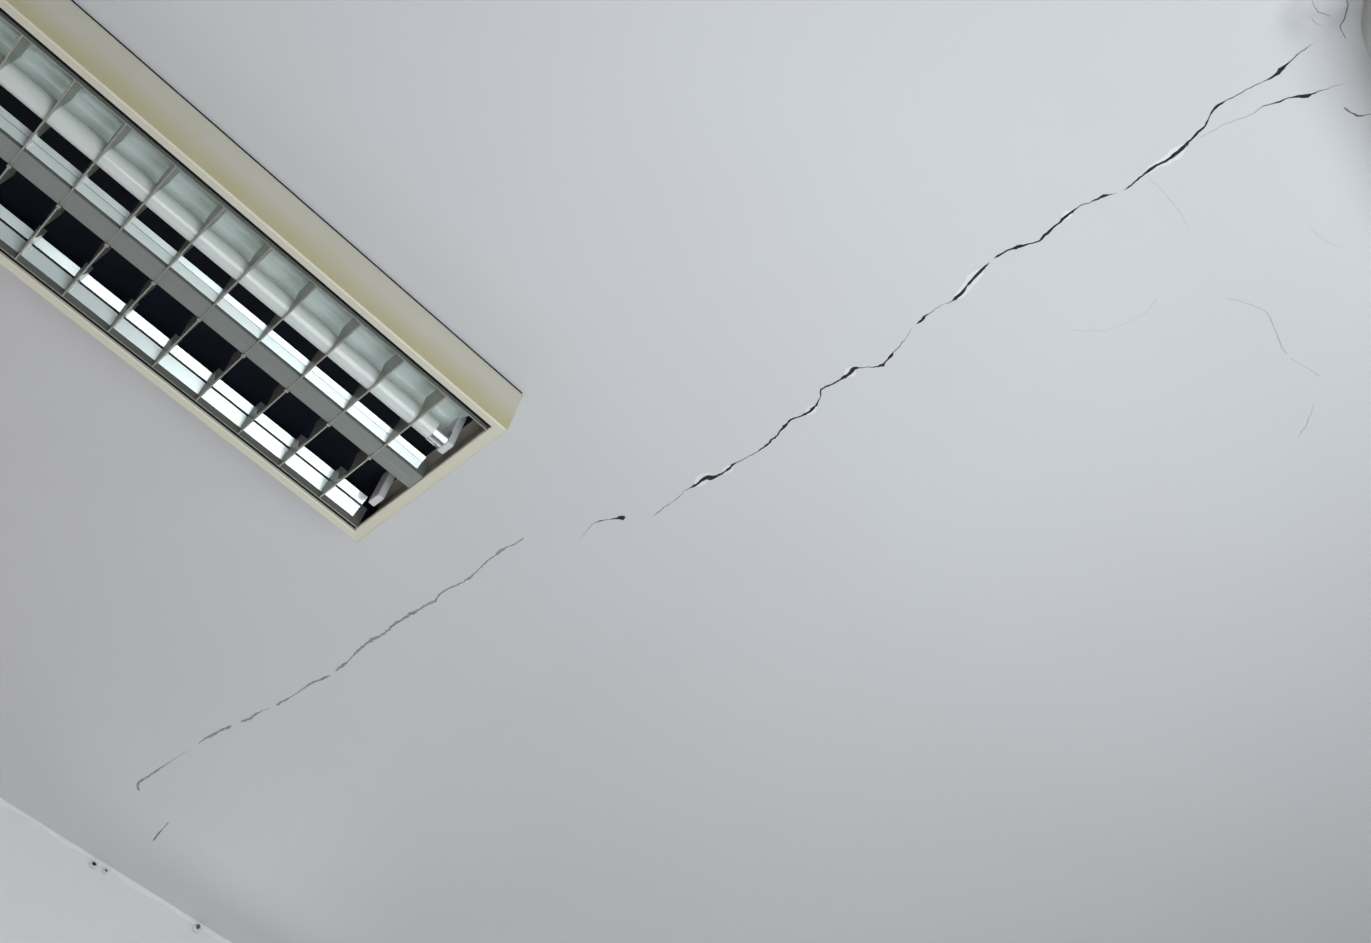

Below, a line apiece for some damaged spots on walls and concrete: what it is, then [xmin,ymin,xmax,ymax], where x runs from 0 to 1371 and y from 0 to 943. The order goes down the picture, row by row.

crack [580,0,1370,539]
crack [136,537,524,791]